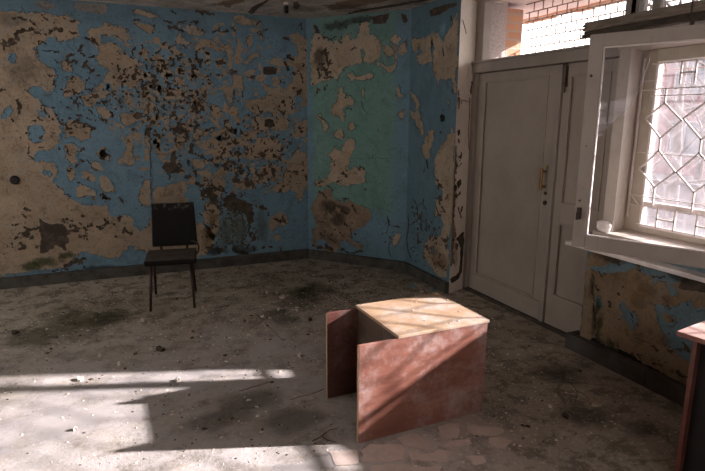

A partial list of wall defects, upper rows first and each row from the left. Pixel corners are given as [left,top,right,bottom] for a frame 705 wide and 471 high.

peeling [0,0,464,283]
peeling [580,252,705,385]